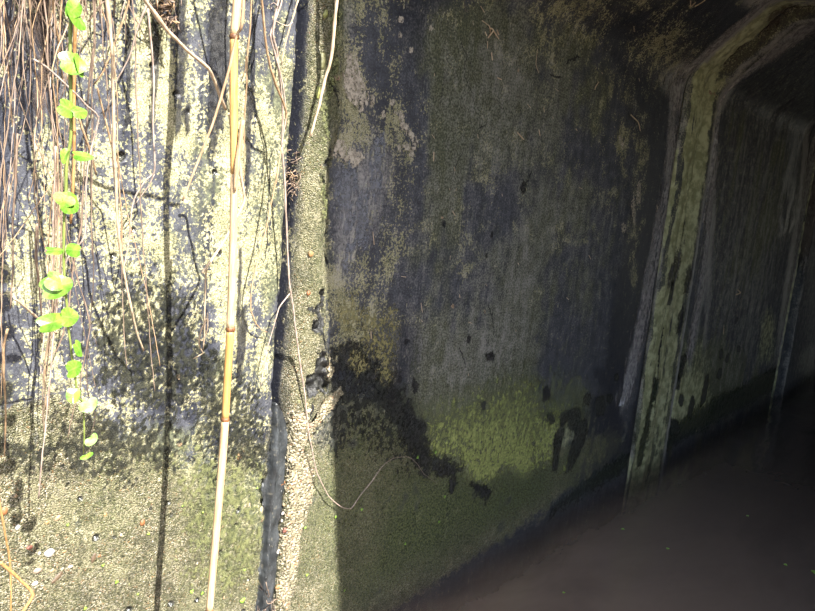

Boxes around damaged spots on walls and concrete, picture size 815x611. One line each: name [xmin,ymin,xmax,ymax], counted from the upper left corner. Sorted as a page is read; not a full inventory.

damp [123,29,132,132]
damp [148,4,161,145]
damp [173,0,191,136]
damp [207,0,230,159]
damp [245,1,256,197]
damp [0,247,273,493]
damp [307,326,464,495]
damp [549,376,660,519]
damp [547,0,772,473]
damp [666,123,815,452]